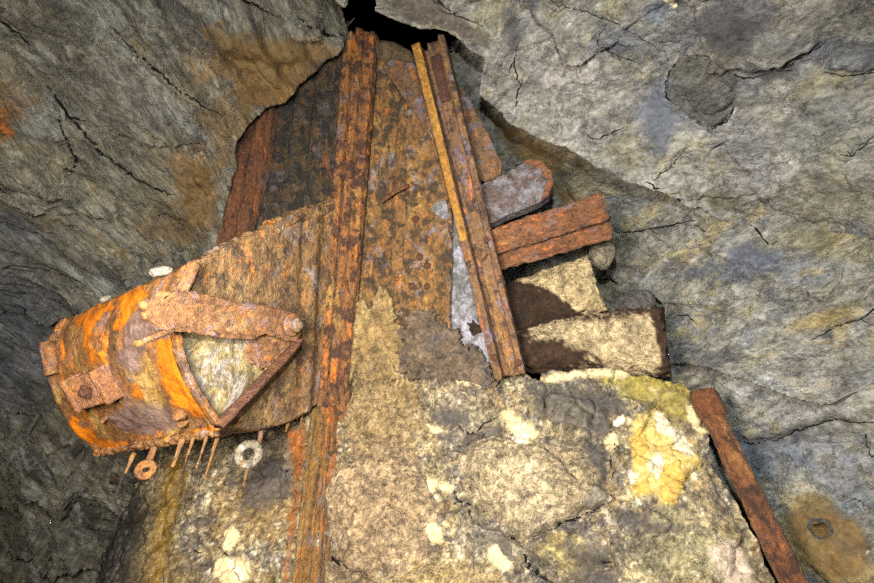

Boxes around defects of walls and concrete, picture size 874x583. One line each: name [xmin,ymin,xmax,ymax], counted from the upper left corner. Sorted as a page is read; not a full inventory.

crack [730,43,824,80]
crack [826,70,874,78]
crack [613,150,705,234]
corrosion [74,286,147,363]
corrosion [157,337,215,433]
corrosion [68,416,128,448]
corrosion [286,428,304,578]